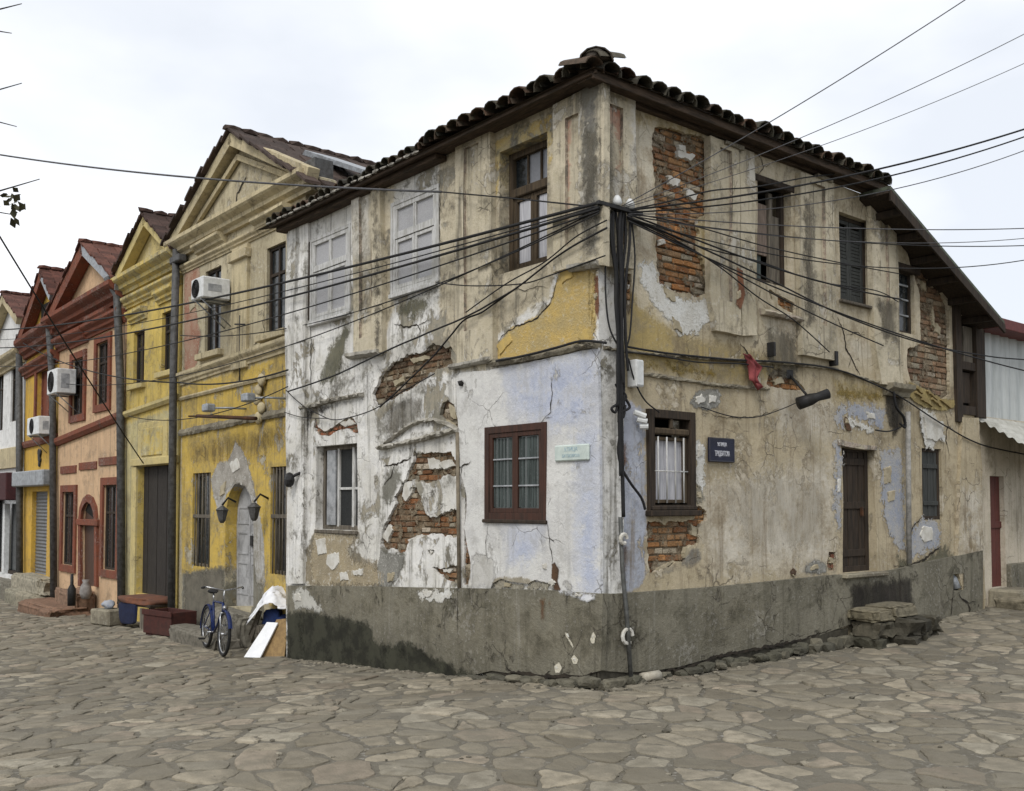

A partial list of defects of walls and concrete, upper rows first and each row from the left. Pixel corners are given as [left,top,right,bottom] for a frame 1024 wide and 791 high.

spalling [626,128,710,337]
spalling [211,443,256,502]
spalling [315,417,358,436]
spalling [292,452,471,613]
spalling [375,344,453,405]
peeling [497,269,600,359]
spalling [646,440,707,573]
peeling [831,400,887,531]
peeling [877,443,942,561]
spalling [907,274,955,451]
leakage [285,609,473,676]